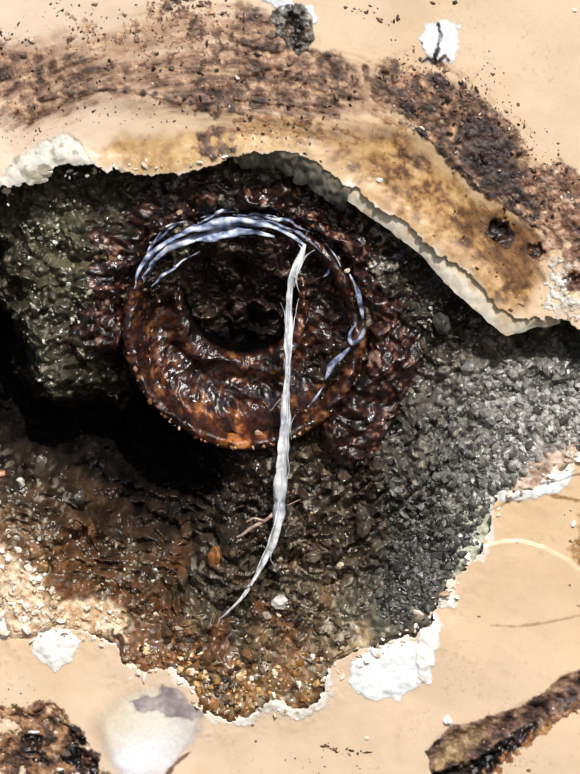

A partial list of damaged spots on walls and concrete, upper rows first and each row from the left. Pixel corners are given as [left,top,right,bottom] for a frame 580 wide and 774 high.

damp [0,0,580,308]
damp [308,274,366,407]
corrosion [541,256,580,321]
spalling [0,134,580,726]
spalling [425,670,580,774]